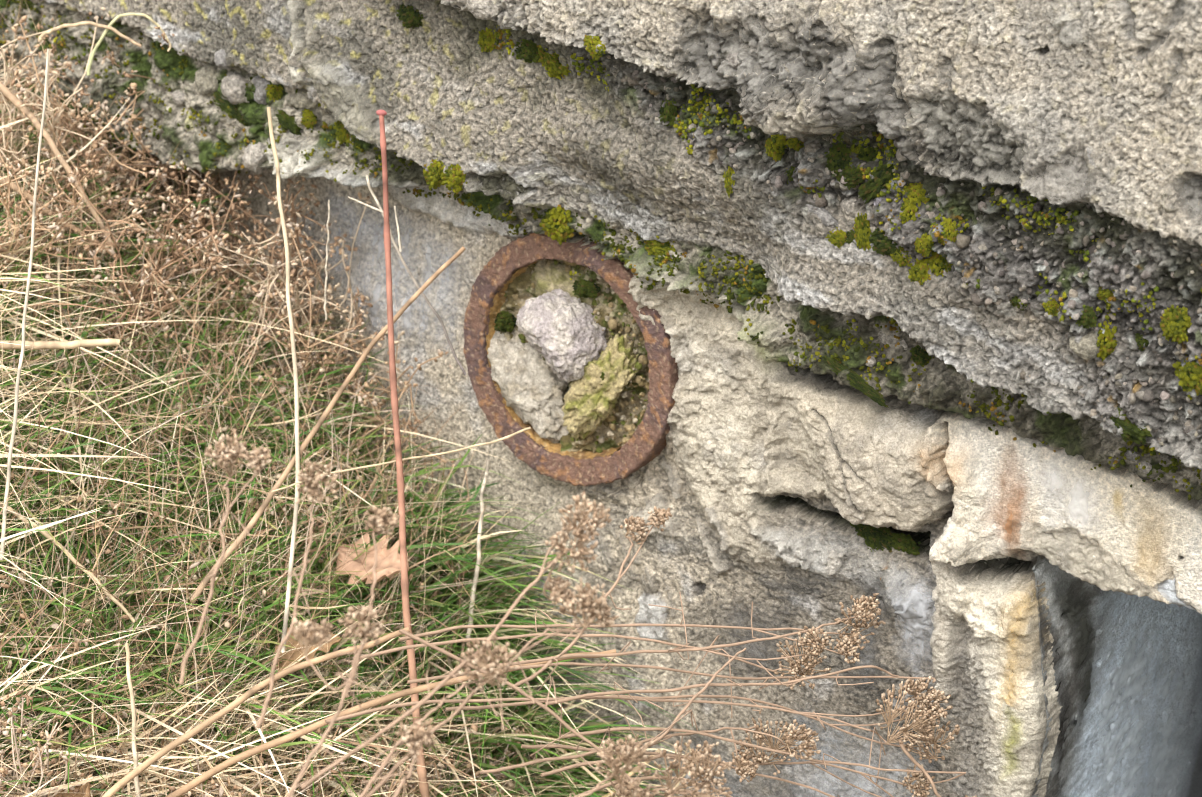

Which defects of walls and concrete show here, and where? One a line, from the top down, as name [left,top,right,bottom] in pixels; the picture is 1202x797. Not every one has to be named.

corrosion [1003,484,1022,553]